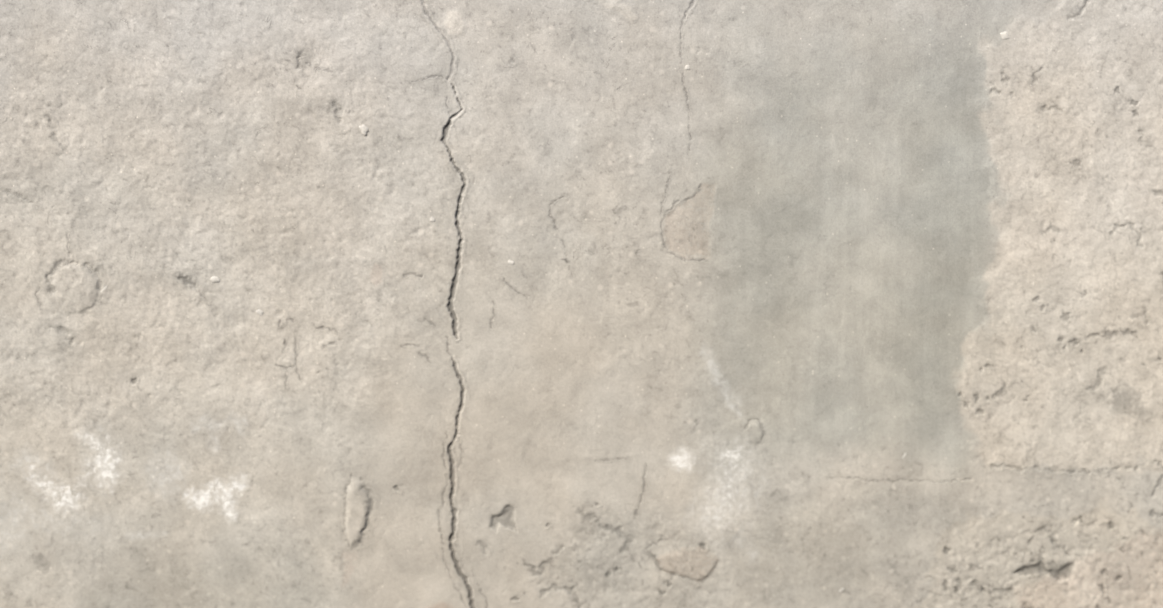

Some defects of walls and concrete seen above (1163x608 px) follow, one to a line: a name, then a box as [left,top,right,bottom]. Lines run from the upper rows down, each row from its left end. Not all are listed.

crack [679,0,698,163]
crack [398,0,528,608]
water stain [662,0,1039,608]
peeling [507,462,733,608]
crack [826,455,1163,499]